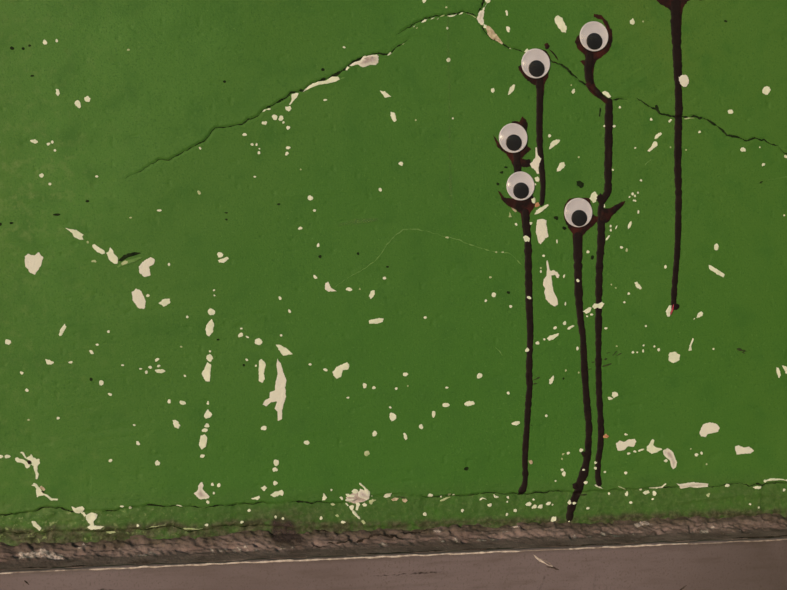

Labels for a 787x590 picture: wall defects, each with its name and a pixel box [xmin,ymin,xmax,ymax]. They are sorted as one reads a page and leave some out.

crack [126,0,524,178]
crack [550,59,586,85]
crack [614,98,787,154]
peeling [25,252,43,275]
peeling [66,228,155,277]
peeling [543,260,559,306]
peeling [263,345,292,421]
peeling [700,422,720,437]
peeling [616,433,677,469]
crack [708,480,780,488]
crack [0,507,74,534]
crack [140,502,267,532]